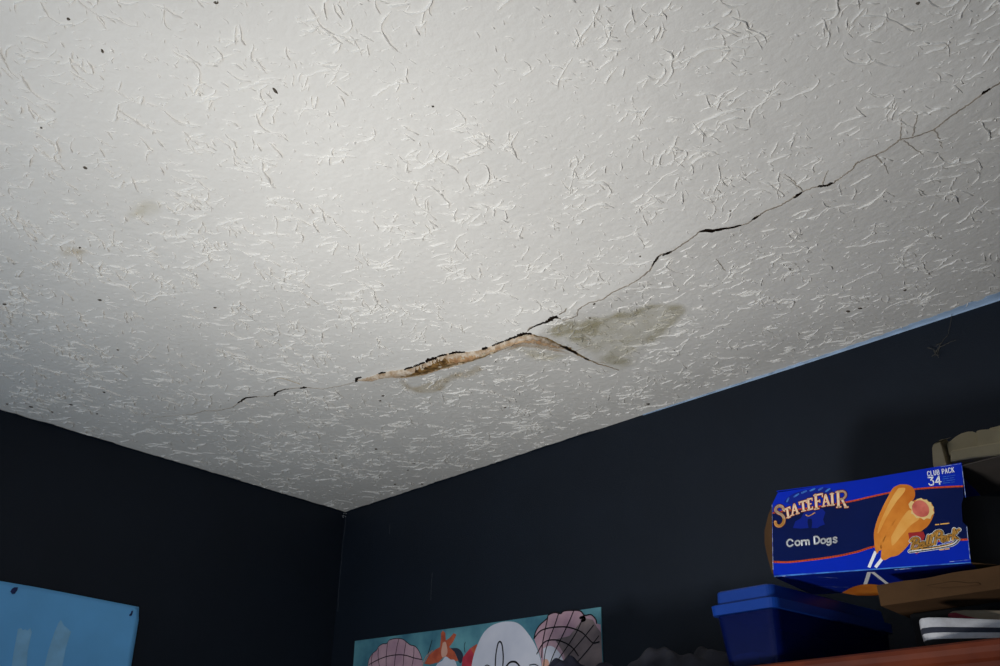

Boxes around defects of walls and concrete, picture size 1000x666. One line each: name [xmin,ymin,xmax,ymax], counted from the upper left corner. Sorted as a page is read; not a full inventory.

flaking render [355,332,566,383]
crack [527,82,1000,370]